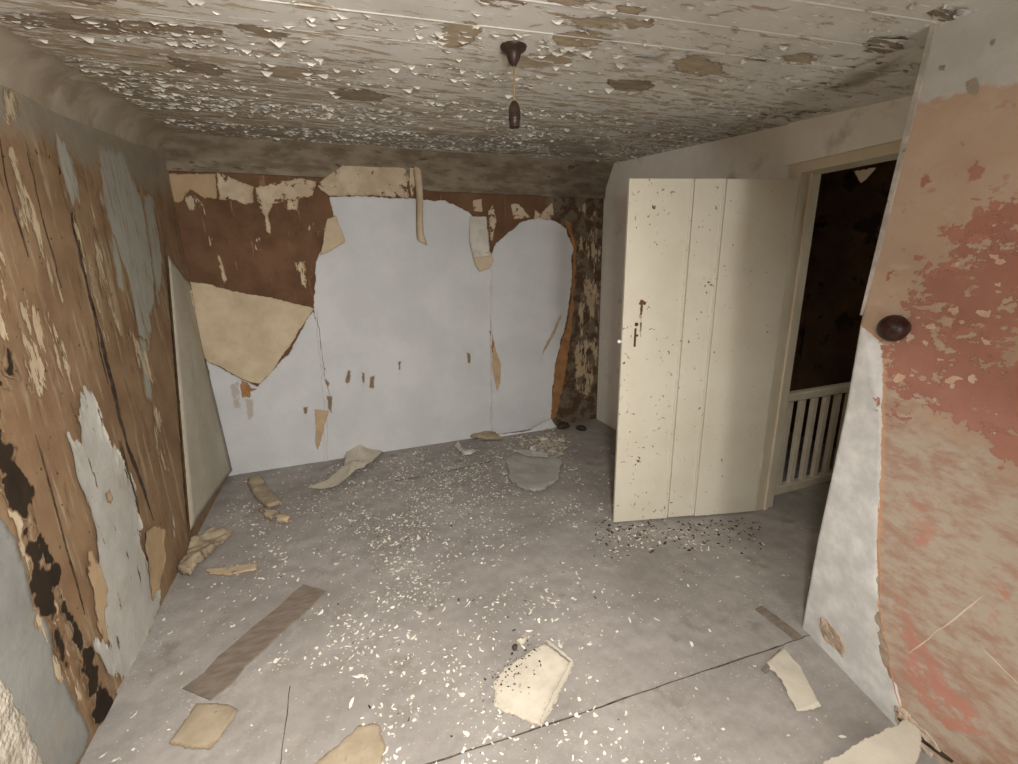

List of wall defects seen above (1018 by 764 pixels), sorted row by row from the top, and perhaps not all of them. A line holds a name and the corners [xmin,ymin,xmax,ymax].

peeling [0,0,860,163]
peeling [850,8,921,89]
peeling [927,4,972,23]
peeling [551,219,577,420]
peeling [874,186,1018,474]
flaking render [0,507,90,764]
mould [0,403,118,727]